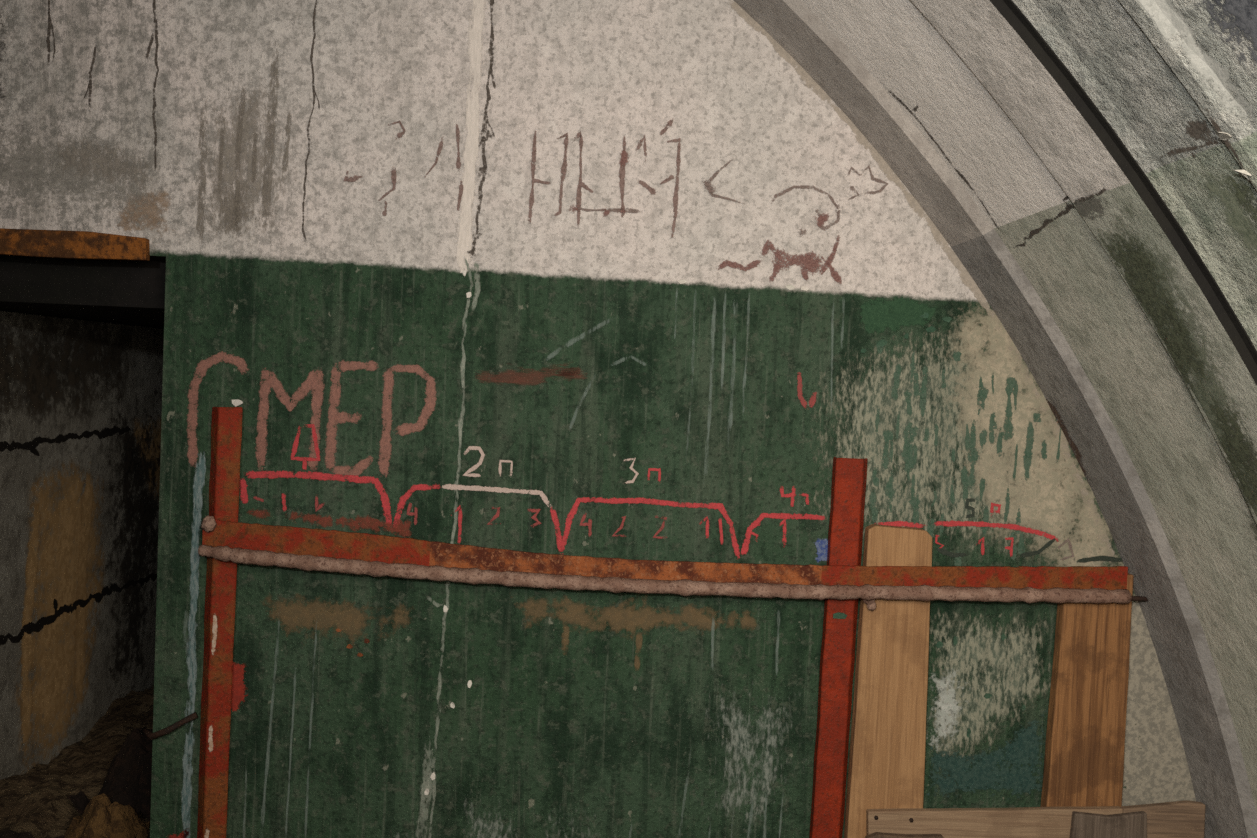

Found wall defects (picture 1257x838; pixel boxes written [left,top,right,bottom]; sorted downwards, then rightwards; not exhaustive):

water stain [0,114,157,213]
crack [146,0,159,168]
water stain [194,56,291,238]
crack [456,0,496,273]
peeling [820,296,1124,567]
rust [266,594,409,657]
rust [520,597,756,670]
water stain [721,707,776,817]